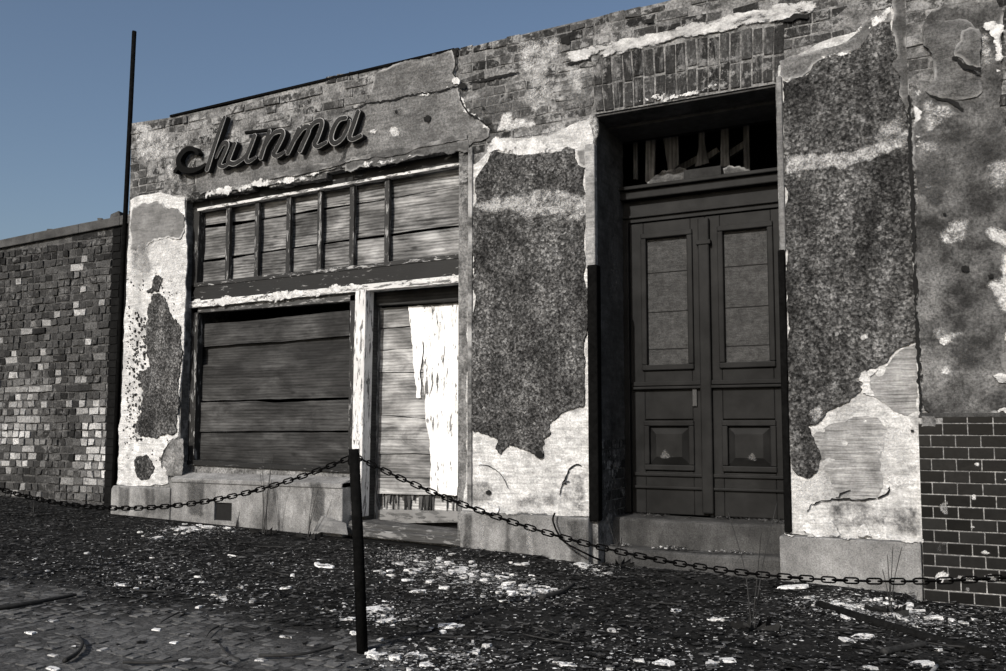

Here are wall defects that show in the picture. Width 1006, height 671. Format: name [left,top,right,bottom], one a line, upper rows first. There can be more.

peeling [561,1,816,65]
flaking render [779,7,892,80]
flaking render [645,84,722,102]
peeling [205,172,319,198]
flaking render [123,271,184,480]
peeling [408,304,458,496]
flaking render [858,345,918,416]
crack [560,464,581,493]
flaking render [802,519,840,537]
crack [807,486,890,512]
flaking render [813,416,890,501]
flaking render [857,524,871,537]